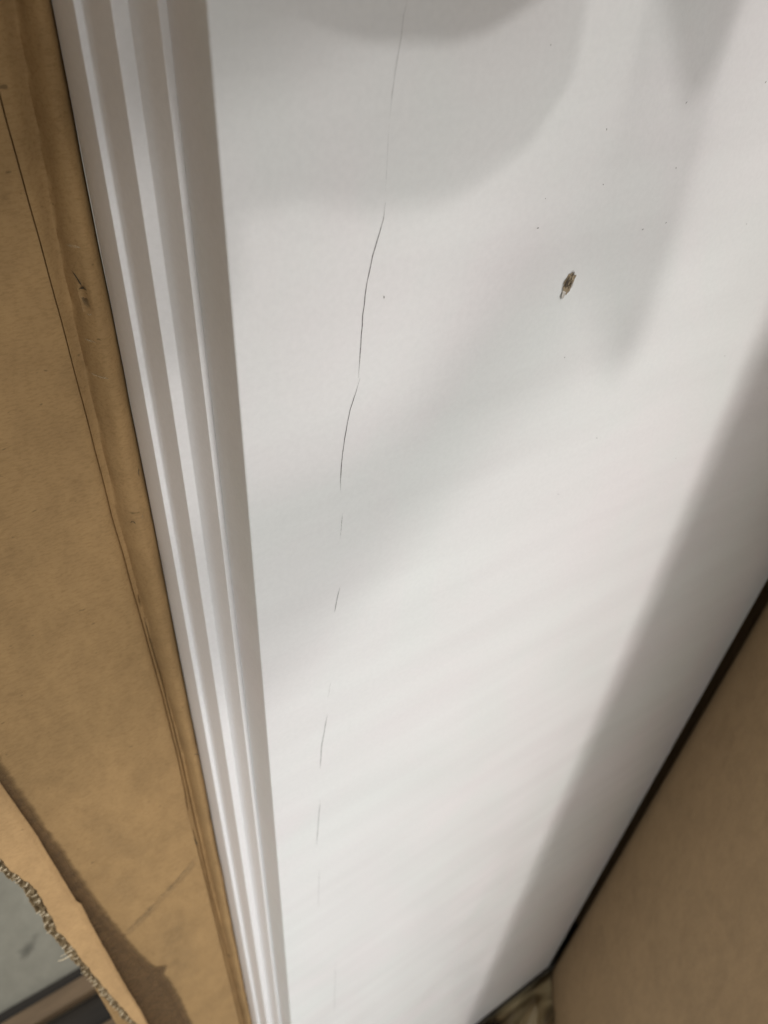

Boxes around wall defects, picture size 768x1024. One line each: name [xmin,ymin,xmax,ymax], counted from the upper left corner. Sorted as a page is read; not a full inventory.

crack [340,211,385,486]